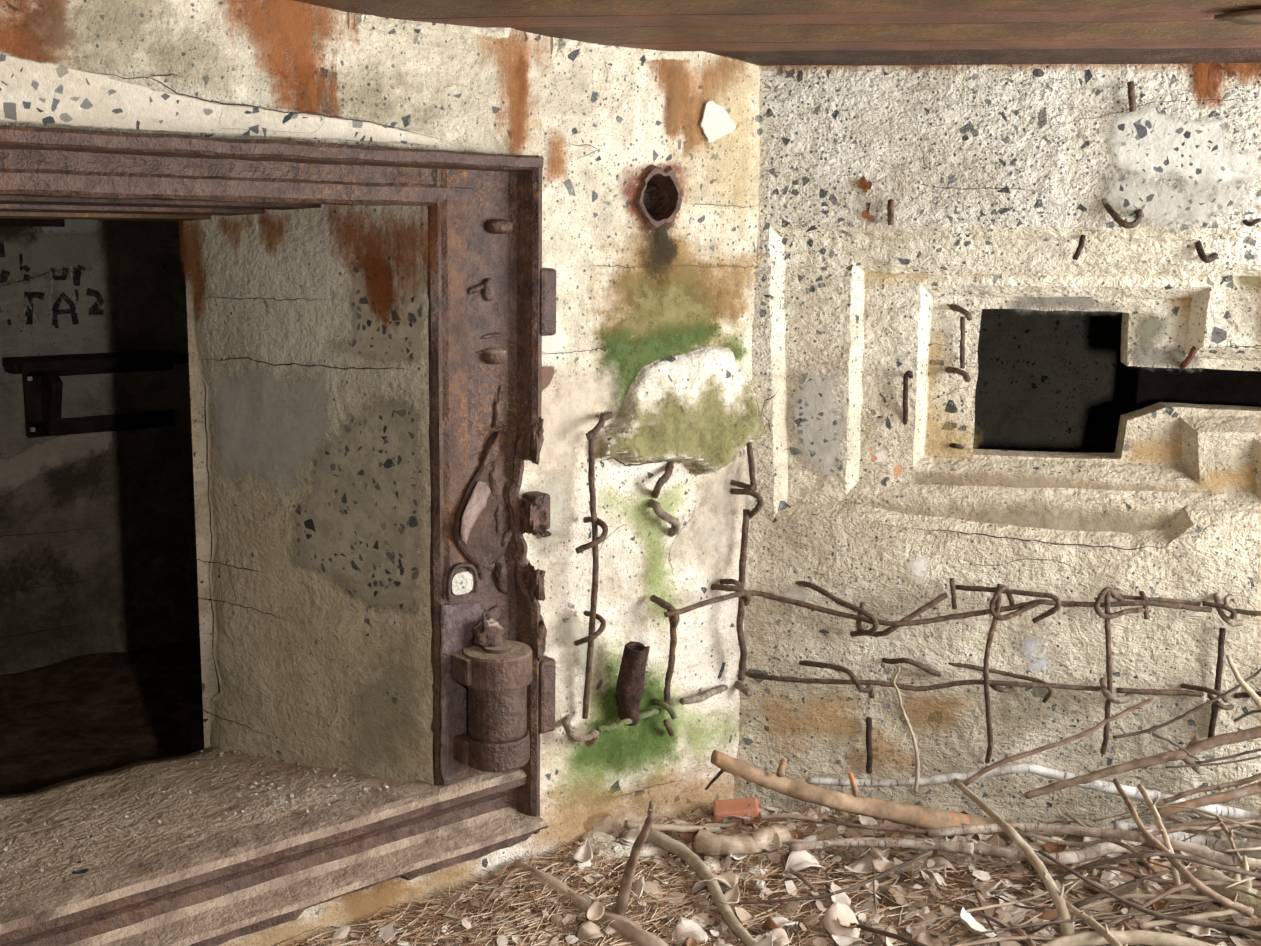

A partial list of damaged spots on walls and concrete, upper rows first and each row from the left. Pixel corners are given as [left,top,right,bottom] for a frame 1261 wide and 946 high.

corrosion [0,0,65,63]
corrosion [232,0,336,116]
corrosion [653,59,703,149]
corrosion [1194,63,1260,102]
corrosion [181,222,204,311]
water stain [616,223,753,320]
water stain [729,344,746,359]
corrosion [479,384,512,547]
spalling [563,618,599,670]
water stain [640,680,664,718]